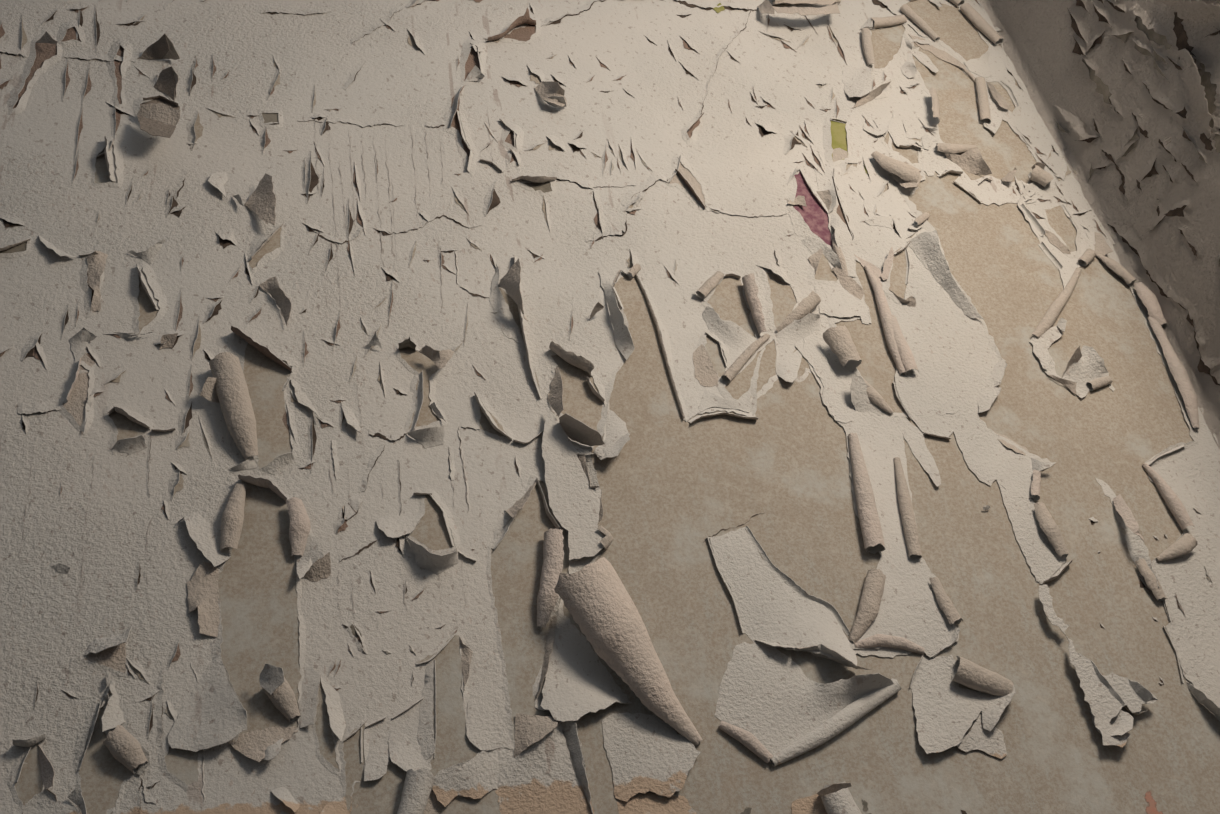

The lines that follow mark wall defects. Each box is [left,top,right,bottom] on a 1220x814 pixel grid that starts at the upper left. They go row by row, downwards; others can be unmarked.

peeling [0,0,283,205]
crack [298,0,446,135]
crack [676,0,758,77]
crack [872,0,901,15]
peeling [0,214,26,228]
crack [164,169,190,217]
peeling [208,172,308,327]
crack [311,209,490,298]
crack [584,166,673,249]
peeling [0,235,184,436]
peeling [189,294,225,360]
peeling [102,364,193,455]